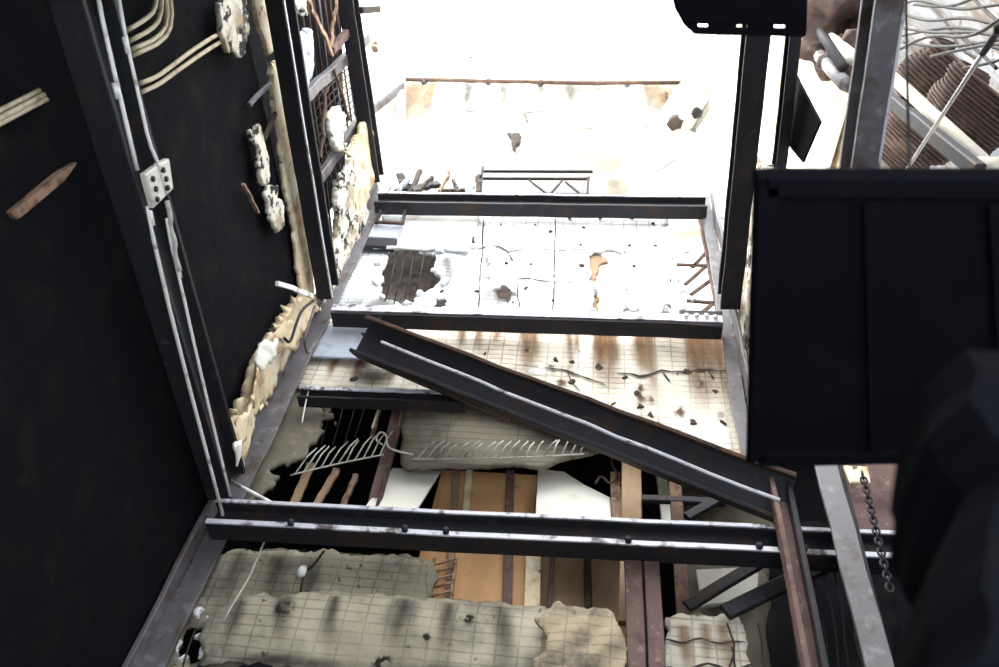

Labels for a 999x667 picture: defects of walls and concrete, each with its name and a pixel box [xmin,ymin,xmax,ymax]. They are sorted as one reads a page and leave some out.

spalling [430,267,450,307]
rust [522,333,535,360]
rust [595,335,615,364]
rust [635,337,651,368]
rust [687,339,722,385]
water stain [328,596,339,620]
water stain [443,603,453,627]
water stain [497,607,509,641]
water stain [249,654,333,667]